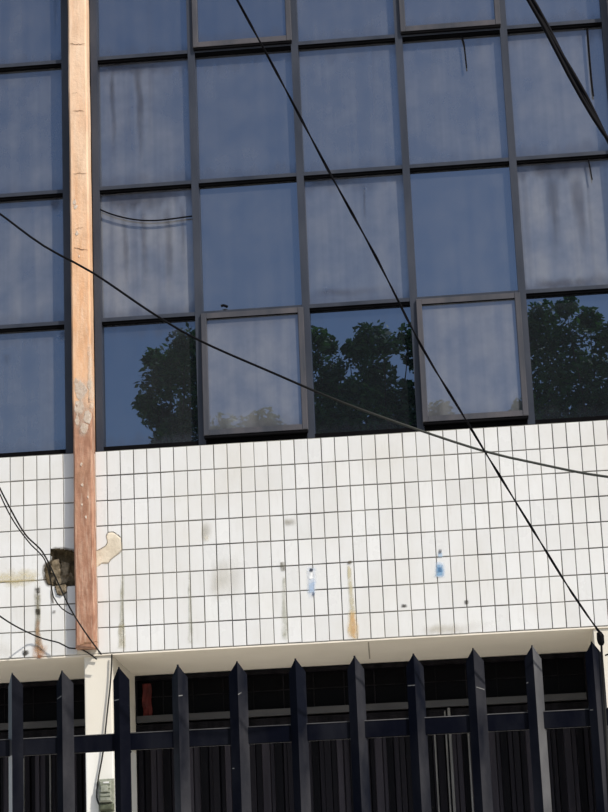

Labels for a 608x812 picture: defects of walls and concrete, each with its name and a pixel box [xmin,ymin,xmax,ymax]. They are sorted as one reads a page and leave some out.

peeling [74,351,93,434]
spalling [44,548,75,596]
peeling [96,532,122,567]
corrosion [348,561,356,637]